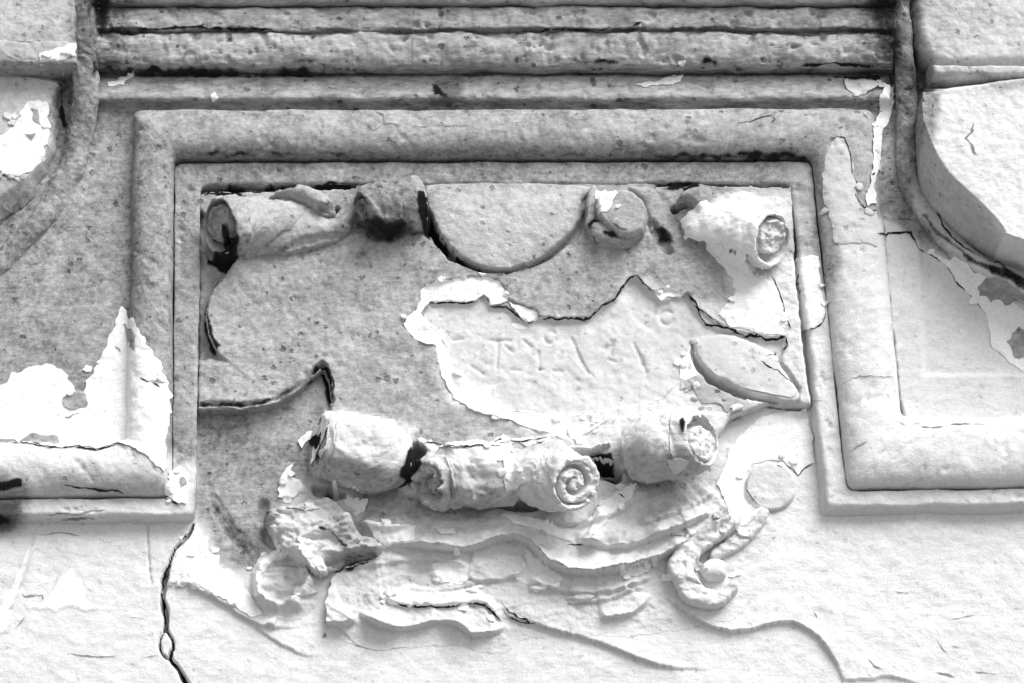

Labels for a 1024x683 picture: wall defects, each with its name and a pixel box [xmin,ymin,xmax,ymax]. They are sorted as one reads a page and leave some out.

peeling [0,100,51,220]
peeling [818,78,895,246]
peeling [0,306,189,504]
crack [539,275,652,321]
spalling [401,199,829,545]
peeling [923,249,1024,372]
crack [136,498,194,683]